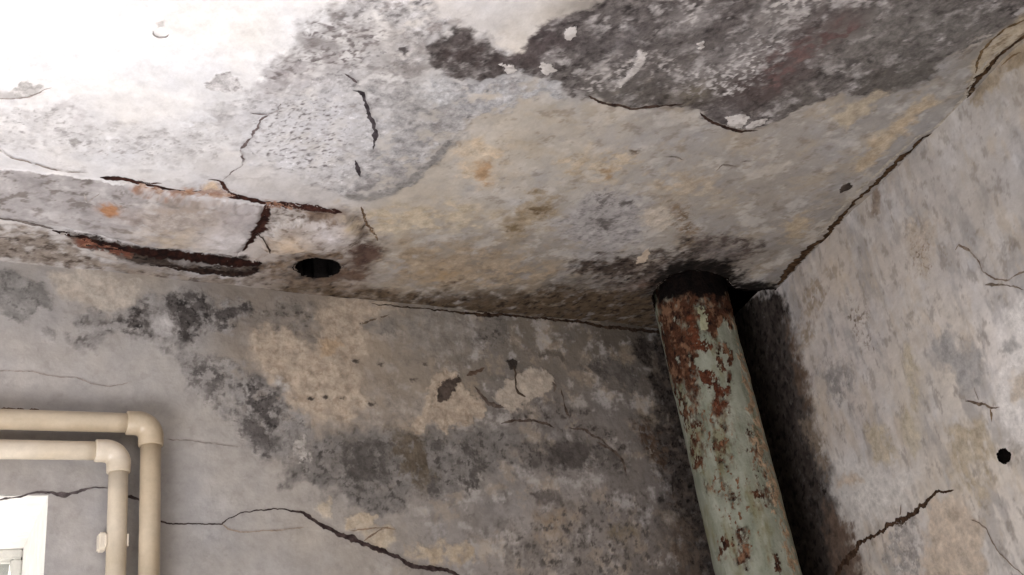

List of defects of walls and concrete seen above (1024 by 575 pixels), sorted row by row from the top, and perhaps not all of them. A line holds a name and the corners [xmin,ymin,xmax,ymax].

crack [0,104,342,278]
corrosion [118,175,296,213]
crack [343,73,380,177]
peeling [0,0,1024,244]
water stain [823,86,948,221]
crack [776,20,1024,290]
peeling [234,295,420,438]
peeling [397,356,570,437]
water stain [0,130,1013,575]
corrosion [653,271,801,575]
crack [161,508,460,575]
crack [835,489,954,575]